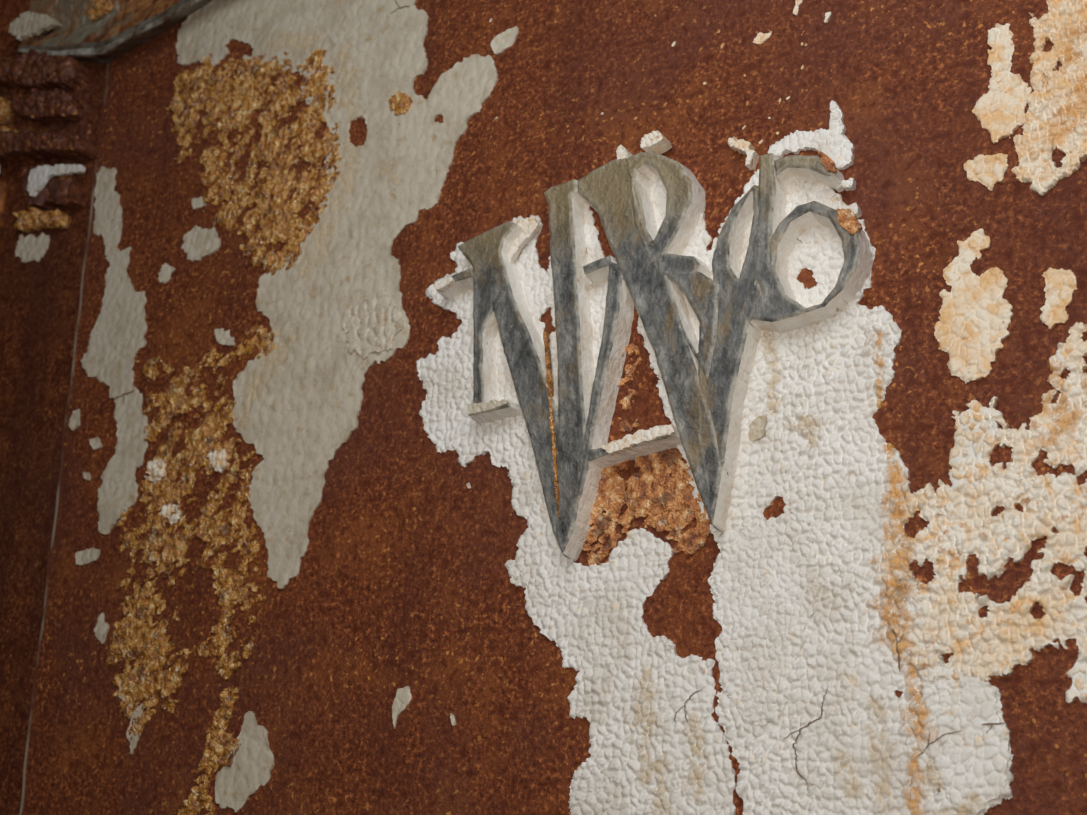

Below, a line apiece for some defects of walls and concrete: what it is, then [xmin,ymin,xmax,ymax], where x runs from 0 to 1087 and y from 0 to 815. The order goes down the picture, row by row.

corrosion [166,49,344,275]
peeling [964,0,1087,196]
peeling [27,164,148,535]
corrosion [106,322,296,815]
peeling [176,0,519,589]
corrosion [543,332,560,518]
corrosion [582,448,712,566]
peeling [416,100,1087,815]
corrosion [874,443,911,660]
peeling [215,711,274,812]
crack [674,686,705,723]
crack [783,688,828,783]